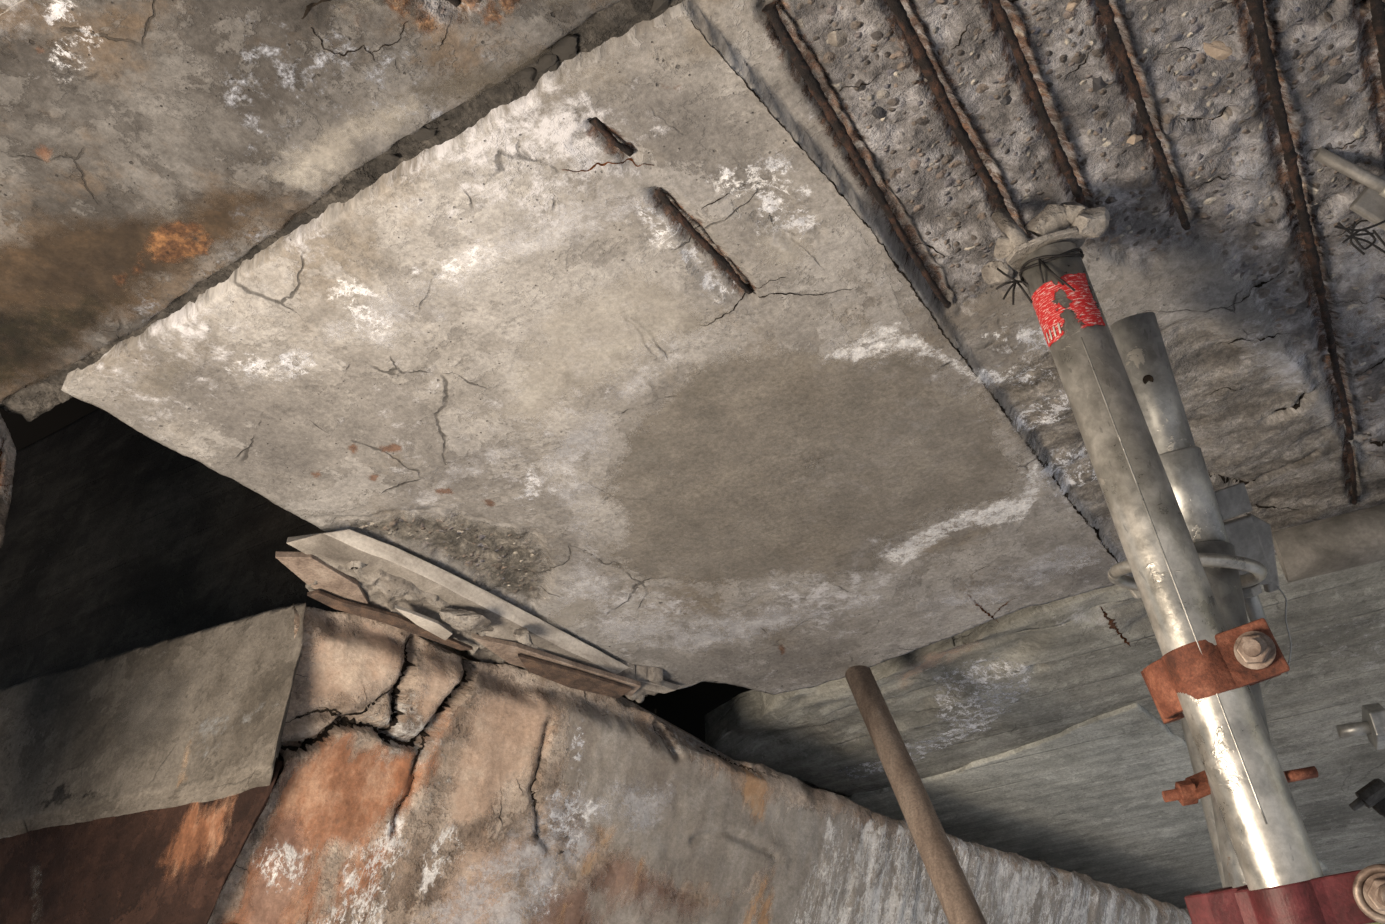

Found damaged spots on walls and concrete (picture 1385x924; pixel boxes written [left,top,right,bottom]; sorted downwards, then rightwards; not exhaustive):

damp [45,1,72,25]
crack [567,158,654,172]
rust [765,0,947,300]
rust [881,0,1032,235]
damp [0,191,269,388]
crack [691,20,1118,563]
spalling [762,0,1385,541]
damp [563,323,1097,606]
peeling [395,605,453,640]
rust [165,801,235,875]
rust [219,715,449,924]
crack [281,637,468,827]